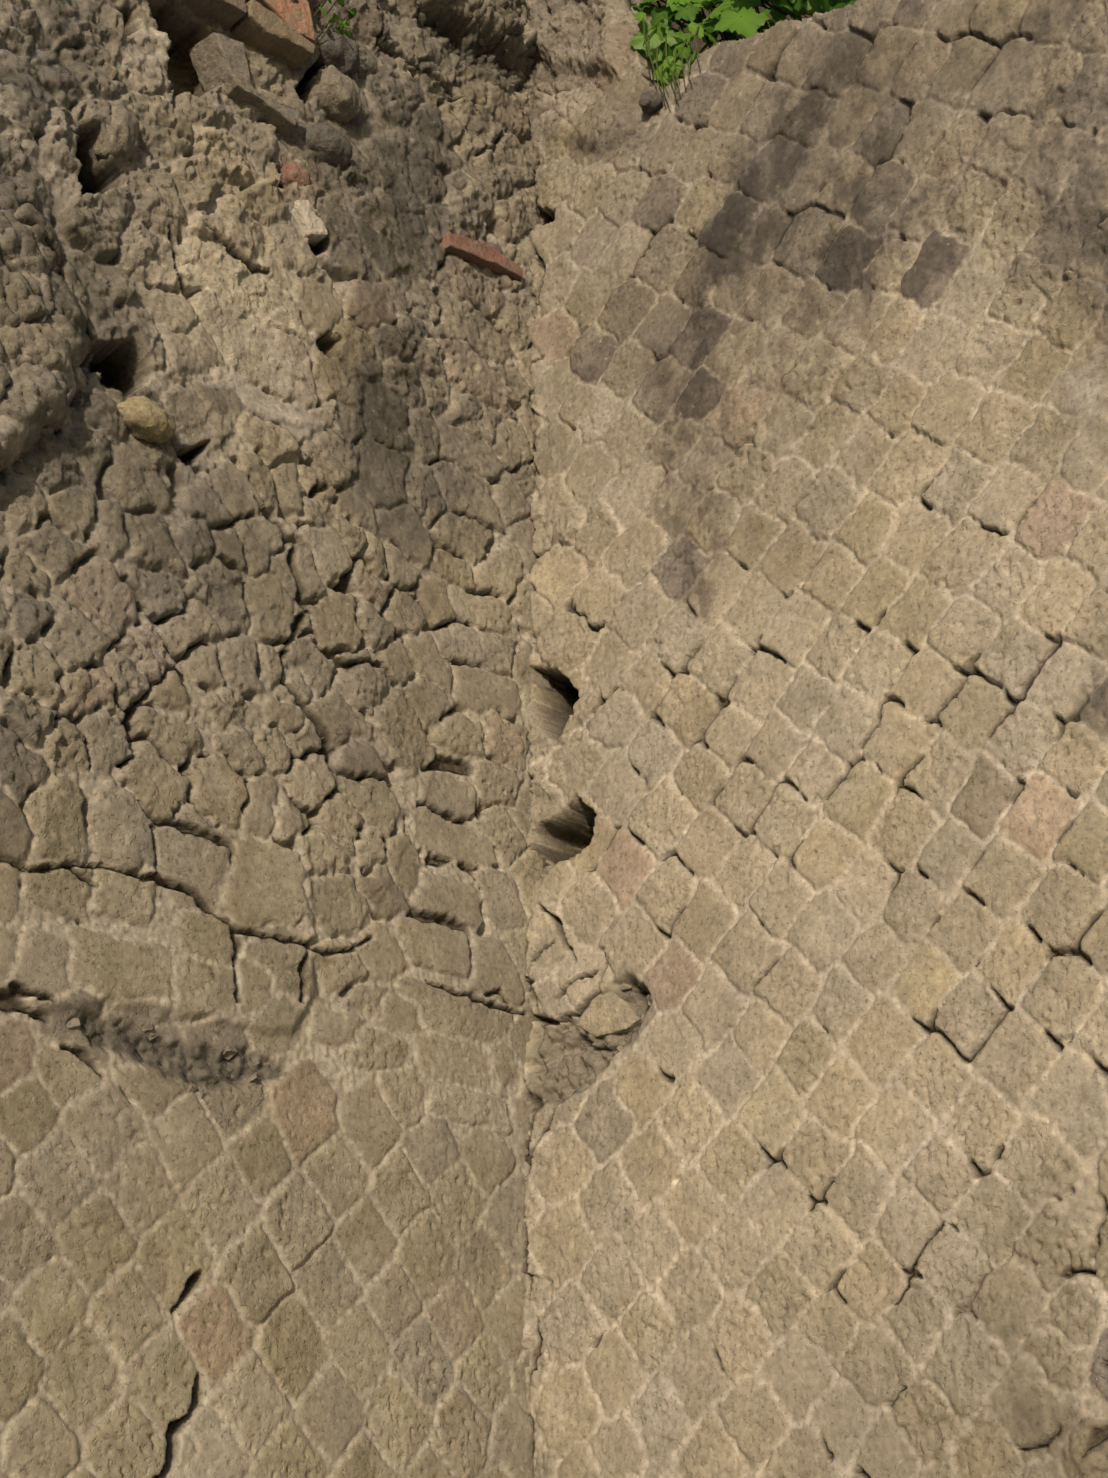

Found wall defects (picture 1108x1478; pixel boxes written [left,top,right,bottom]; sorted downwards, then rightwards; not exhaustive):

spalling [151,16,204,98]
spalling [291,200,328,251]
spalling [87,359,124,394]
crack [279,537,399,670]
crack [416,758,479,824]
crack [0,860,369,1002]
crack [406,908,466,934]
crack [1034,918,1099,964]
crack [0,985,97,1074]
crack [913,962,1013,1062]
crack [180,1274,196,1296]
crack [153,1387,194,1478]